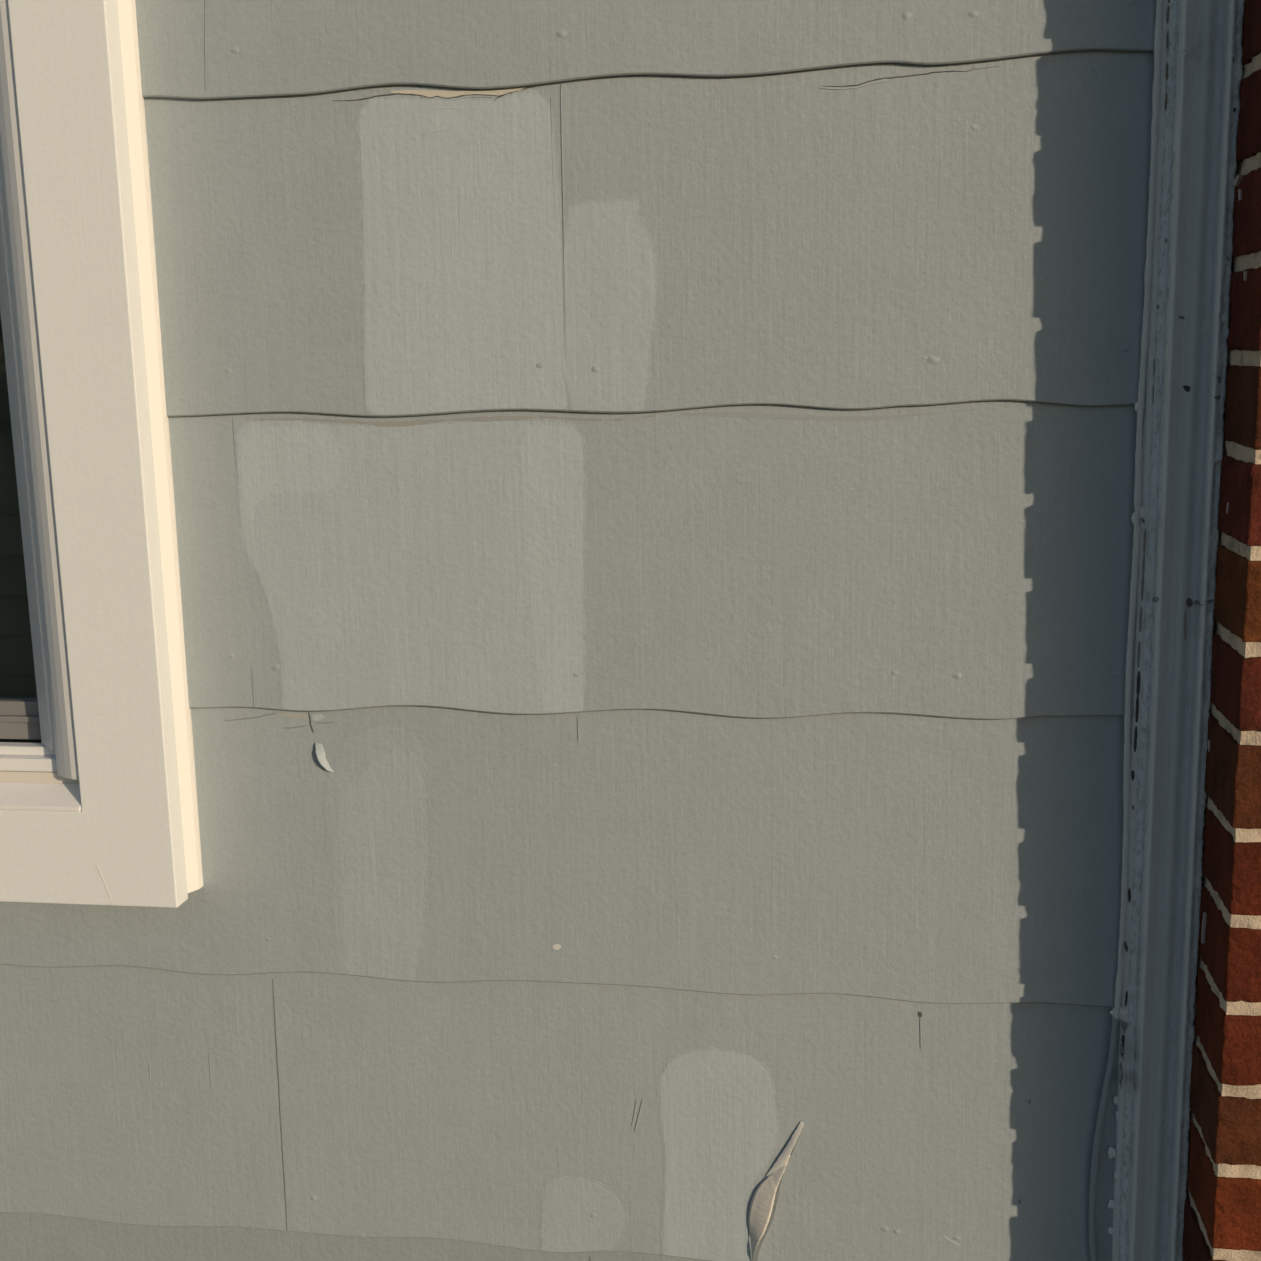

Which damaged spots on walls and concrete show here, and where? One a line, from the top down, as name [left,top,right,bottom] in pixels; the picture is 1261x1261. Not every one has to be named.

peeling [315,743,334,772]
peeling [748,1155,790,1261]